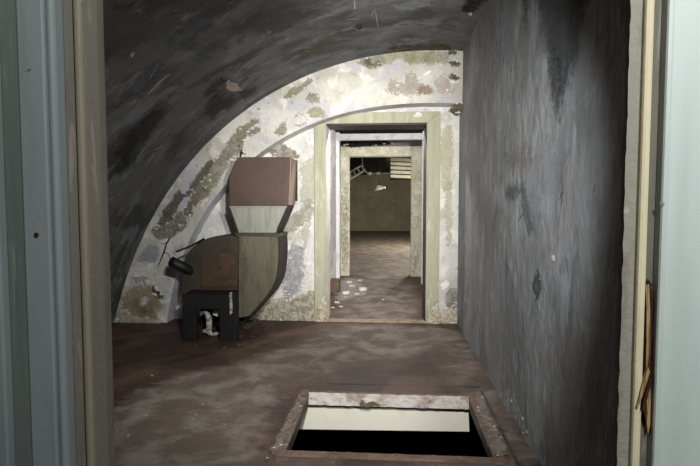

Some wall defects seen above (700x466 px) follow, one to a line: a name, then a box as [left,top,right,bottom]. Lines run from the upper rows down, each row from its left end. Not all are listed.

flaking render [219,75,255,99]
peeling [357,57,382,70]
peeling [385,50,460,96]
peeling [151,103,268,240]
crack [157,237,171,268]
peeling [248,241,343,322]
flaking render [428,280,457,324]